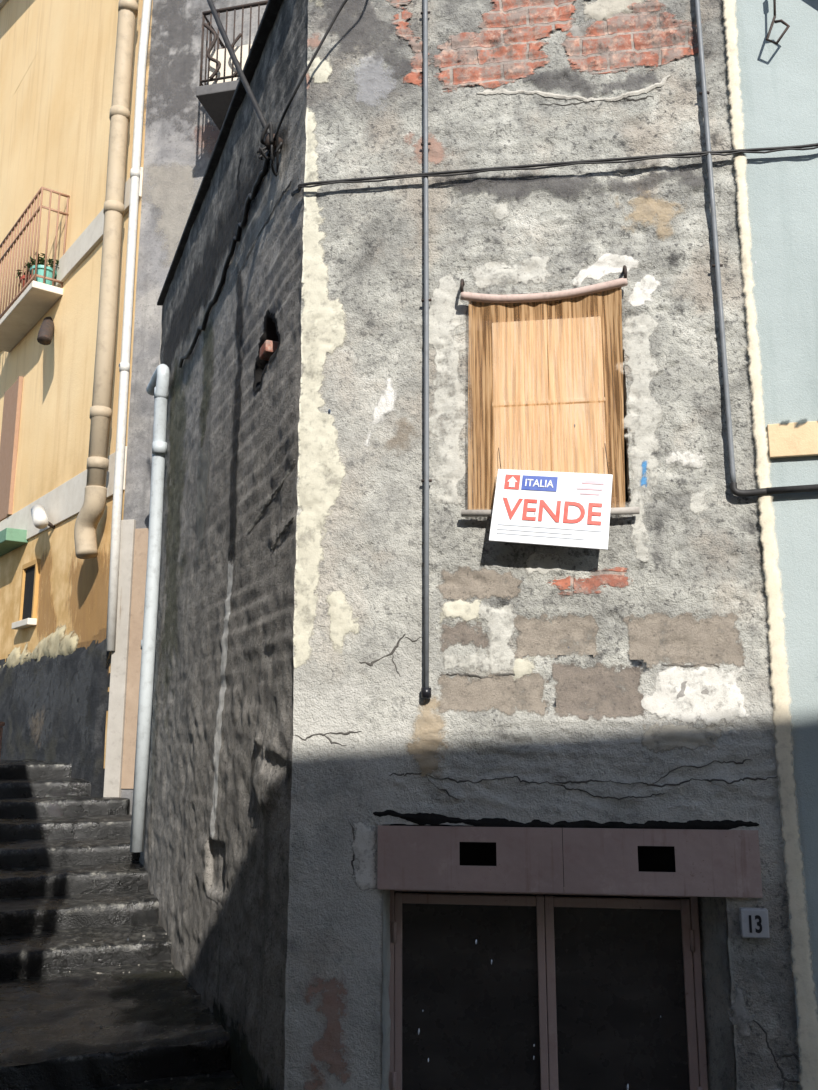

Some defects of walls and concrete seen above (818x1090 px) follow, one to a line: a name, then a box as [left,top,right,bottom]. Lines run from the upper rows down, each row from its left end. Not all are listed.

flaking render [386,0,699,92]
flaking render [490,203,511,220]
flaking render [293,108,359,668]
flaking render [423,275,469,505]
flaking render [436,253,751,753]
crack [359,633,420,675]
crack [296,731,362,746]
crack [350,759,778,878]
crack [753,1020,801,1090]